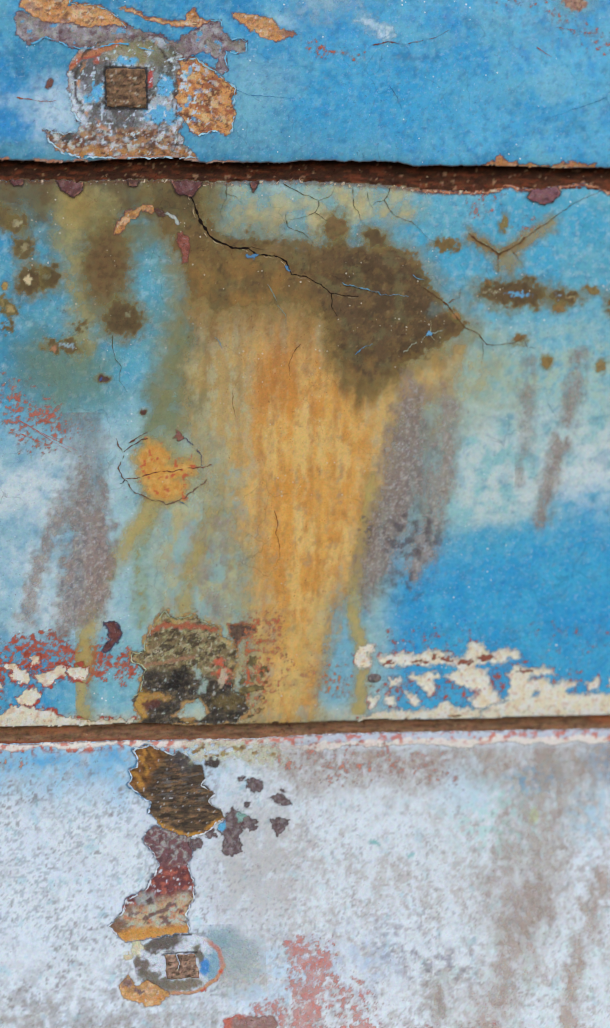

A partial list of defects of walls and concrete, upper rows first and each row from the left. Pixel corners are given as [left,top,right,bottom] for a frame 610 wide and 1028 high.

peeling [14,0,297,160]
crack [188,183,435,314]
crack [466,192,599,269]
crack [423,287,533,357]
crack [117,429,212,505]
corrosion [0,179,478,723]
peeling [0,609,610,1007]